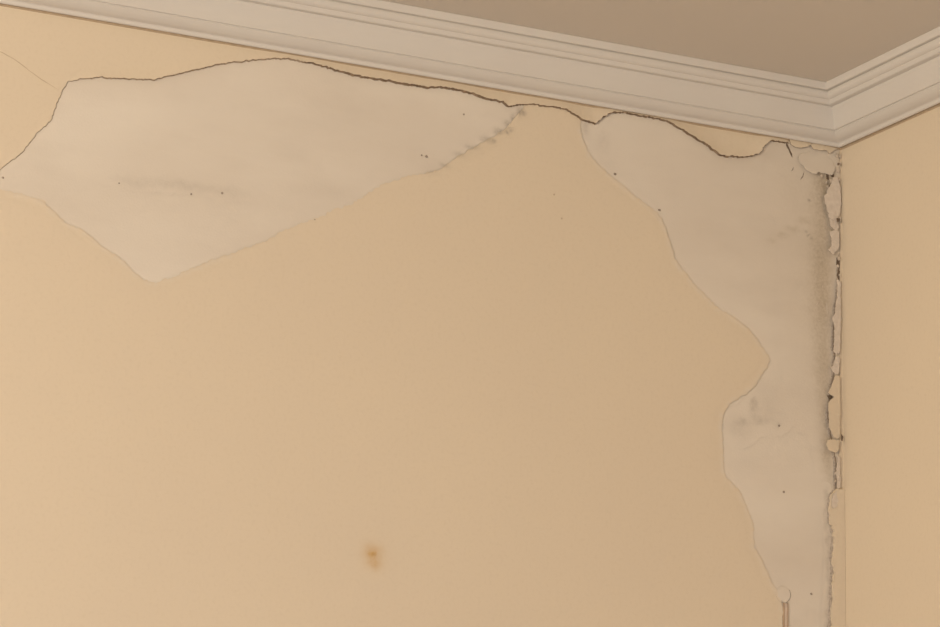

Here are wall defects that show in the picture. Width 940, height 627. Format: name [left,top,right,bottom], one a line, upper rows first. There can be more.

peeling [0,43,525,289]
peeling [525,96,837,627]
water stain [722,143,840,496]
peeling [816,274,846,627]
peeling [824,176,842,255]